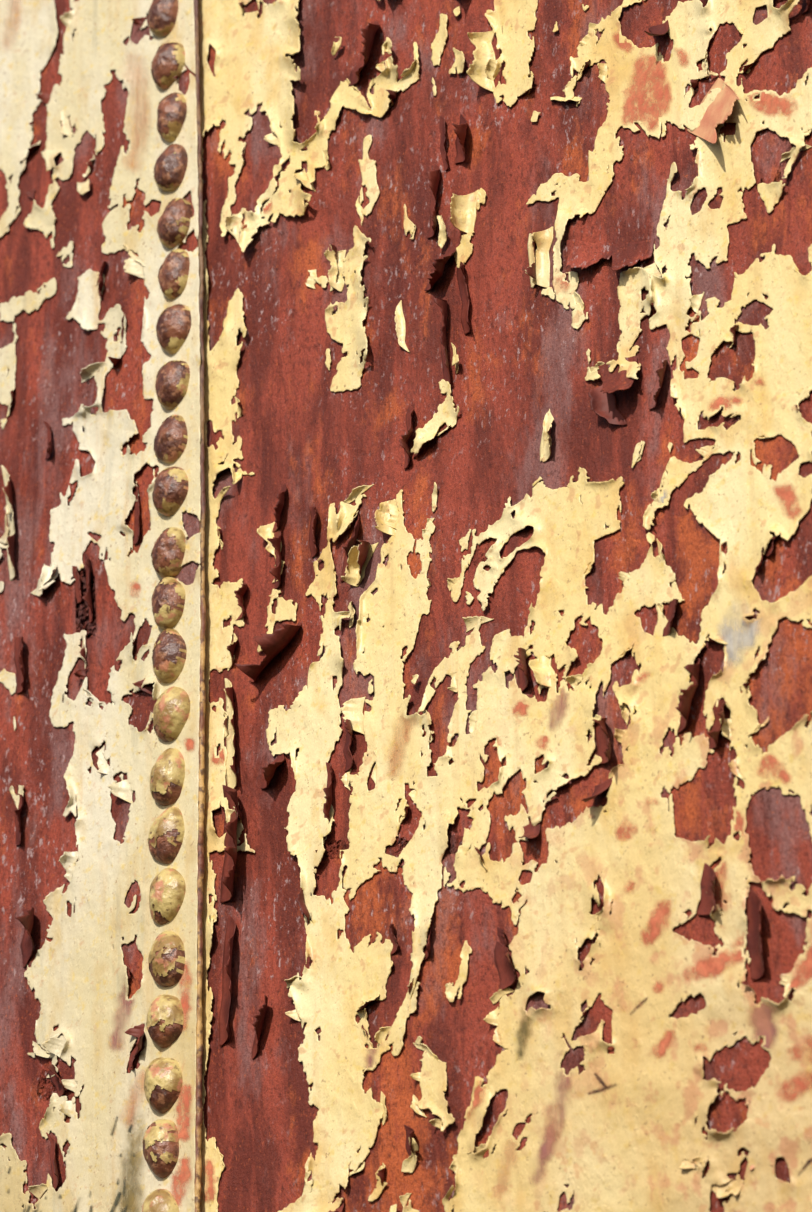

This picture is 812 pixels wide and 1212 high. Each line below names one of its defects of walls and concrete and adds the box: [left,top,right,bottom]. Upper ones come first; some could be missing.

peeling [614,34,671,129]
peeling [750,92,791,115]
peeling [775,486,800,518]
rust [0,0,161,1209]
rust [173,0,812,1212]
peeling [513,702,528,715]
peeling [760,755,790,782]
peeling [714,863,725,907]
peeling [643,903,670,943]
peeling [692,937,744,977]
peeling [788,947,812,990]
peeling [176,1086,191,1140]